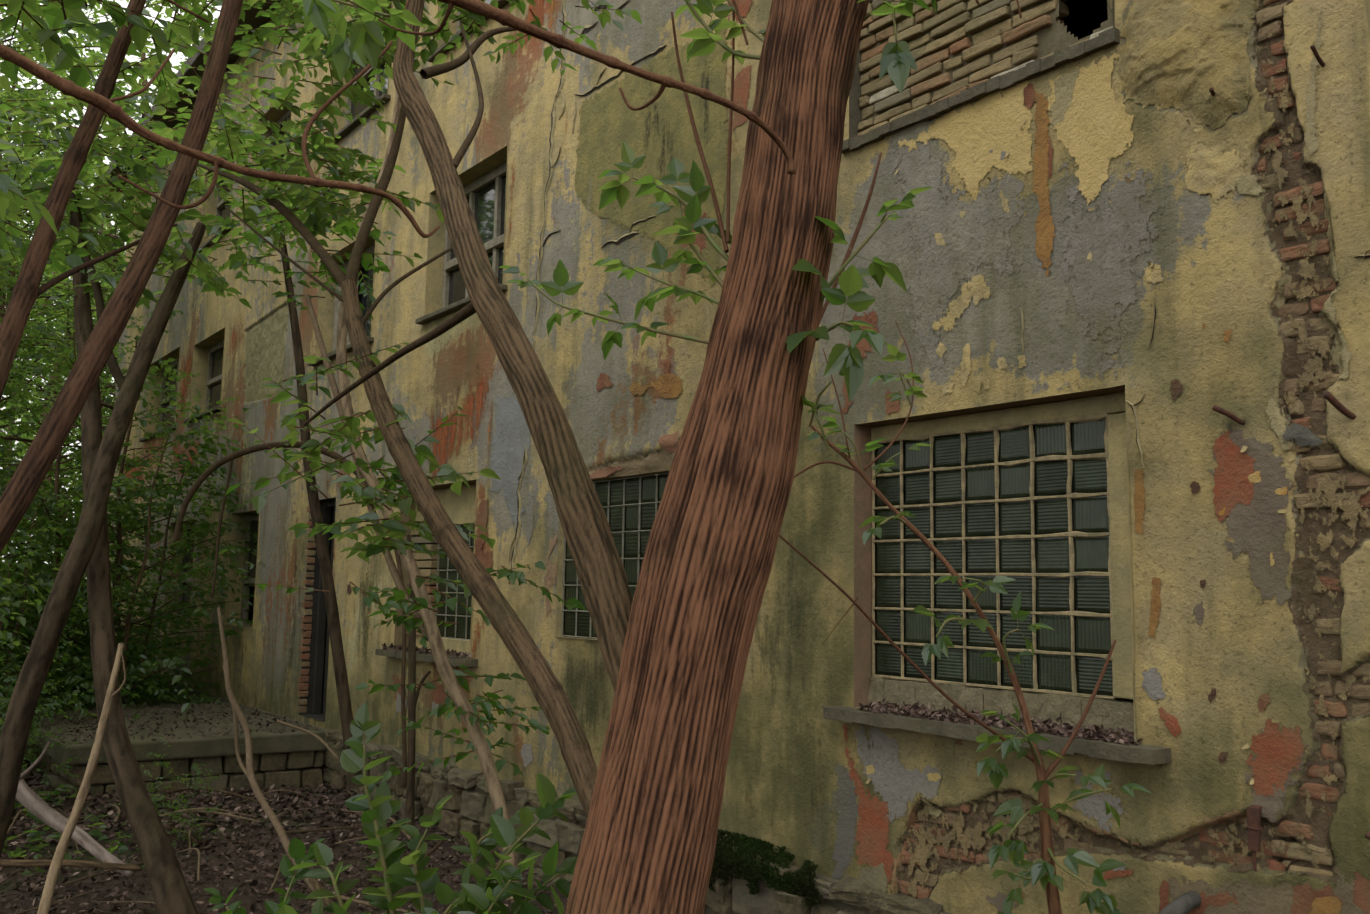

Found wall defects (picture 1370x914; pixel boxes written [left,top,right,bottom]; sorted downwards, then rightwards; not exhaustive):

peeling [732,65,751,131]
rust [1023,83,1055,277]
rust [431,368,491,485]
spalling [832,0,1370,914]